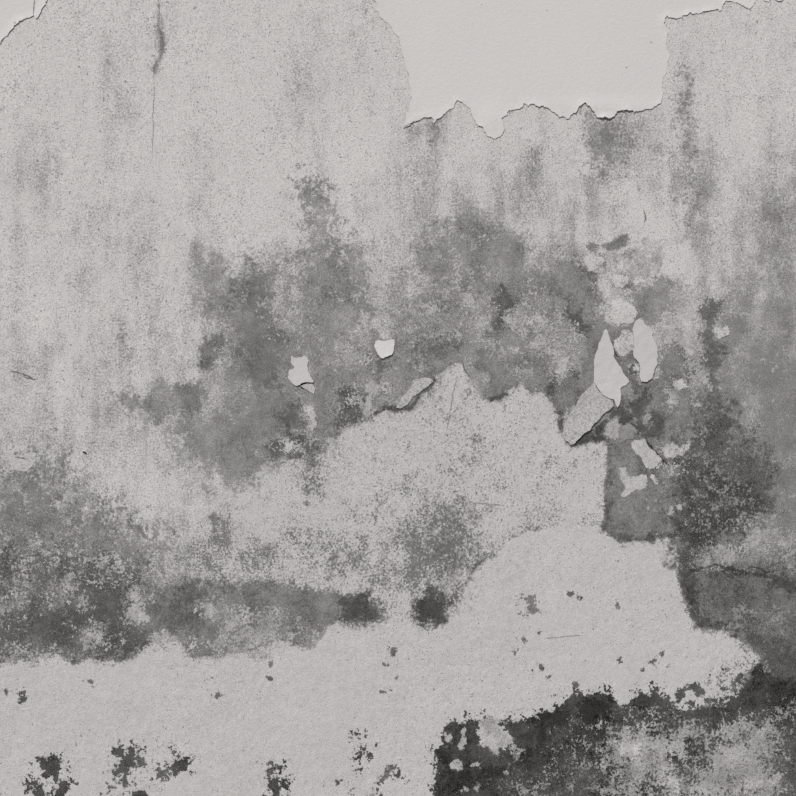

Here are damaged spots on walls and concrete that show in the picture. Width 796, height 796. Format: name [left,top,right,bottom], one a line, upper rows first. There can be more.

peeling [0,0,796,250]
peeling [632,319,658,382]
leakage [0,428,383,668]
peeling [0,329,796,796]
leakage [108,162,796,796]